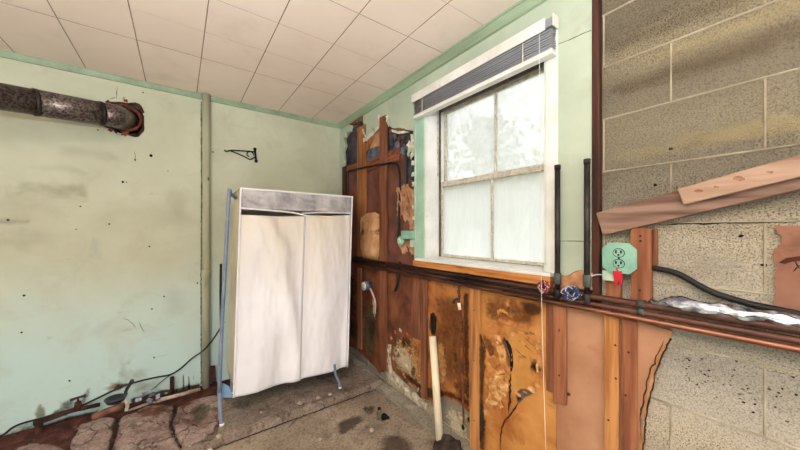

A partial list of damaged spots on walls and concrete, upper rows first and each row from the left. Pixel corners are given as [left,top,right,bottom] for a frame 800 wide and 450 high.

flaking render [362,114,414,220]
crack [109,420,120,450]
crack [170,404,178,443]
peeling [387,328,428,411]
water stain [385,293,469,439]
peeling [483,363,508,445]